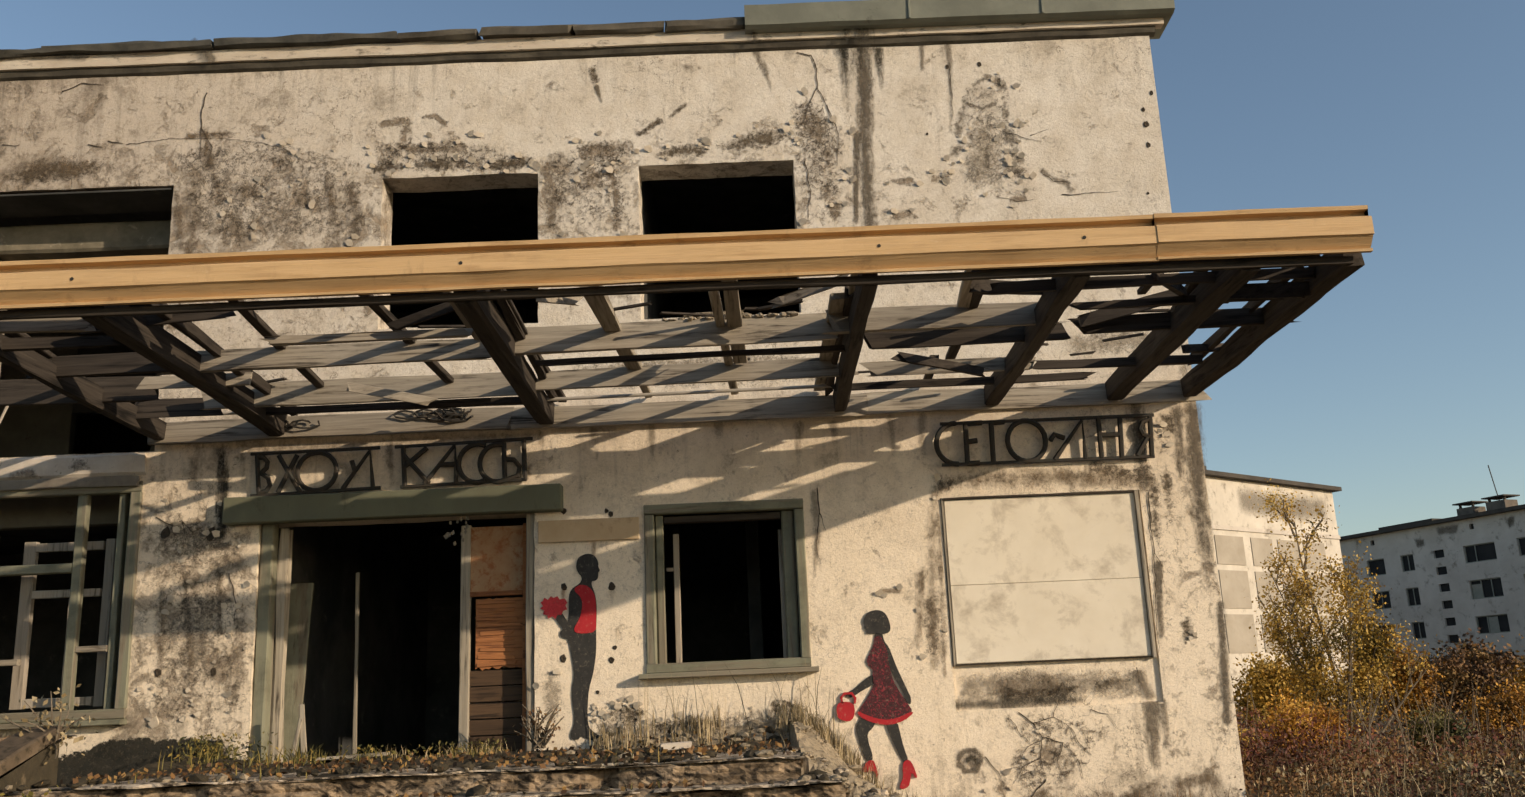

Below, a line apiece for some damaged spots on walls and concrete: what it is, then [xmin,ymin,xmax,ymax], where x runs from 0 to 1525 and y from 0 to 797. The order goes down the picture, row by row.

damp [2,160,96,184]
damp [326,178,359,232]
crack [797,52,839,217]
damp [839,28,883,226]
peeling [891,207,916,220]
peeling [884,62,1070,208]
damp [215,446,229,536]
damp [1171,403,1212,565]
damp [1218,601,1231,726]